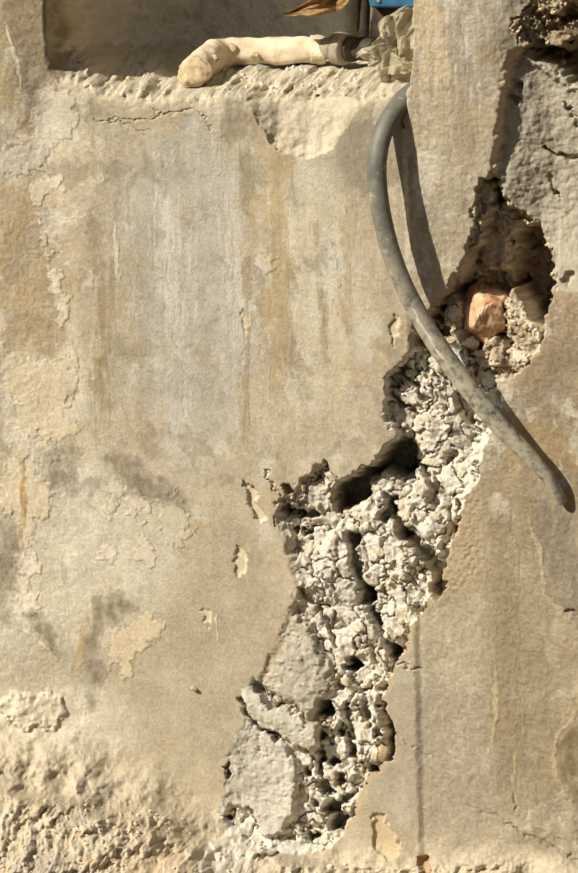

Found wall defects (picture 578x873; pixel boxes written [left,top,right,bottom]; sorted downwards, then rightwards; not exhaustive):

spalling [509,0,578,79]
crack [94,103,226,140]
rust [17,457,28,550]
damp [33,430,85,494]
damp [101,447,190,514]
spalling [216,174,558,856]
peeling [106,609,167,685]
crack [467,794,519,830]